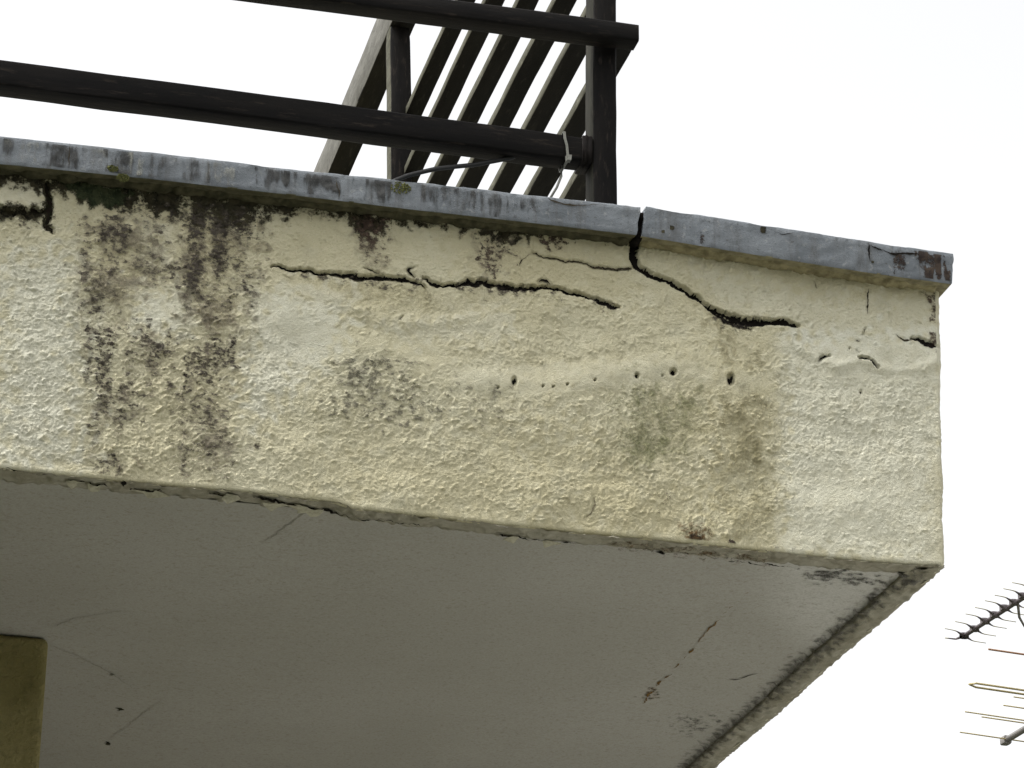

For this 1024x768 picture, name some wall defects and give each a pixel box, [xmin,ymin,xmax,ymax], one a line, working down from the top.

water stain [3,138,14,154]
water stain [0,143,576,476]
crack [271,212,798,330]
crack [897,335,936,348]
rust [893,251,951,281]
rust [635,607,730,703]
water stain [682,567,925,768]